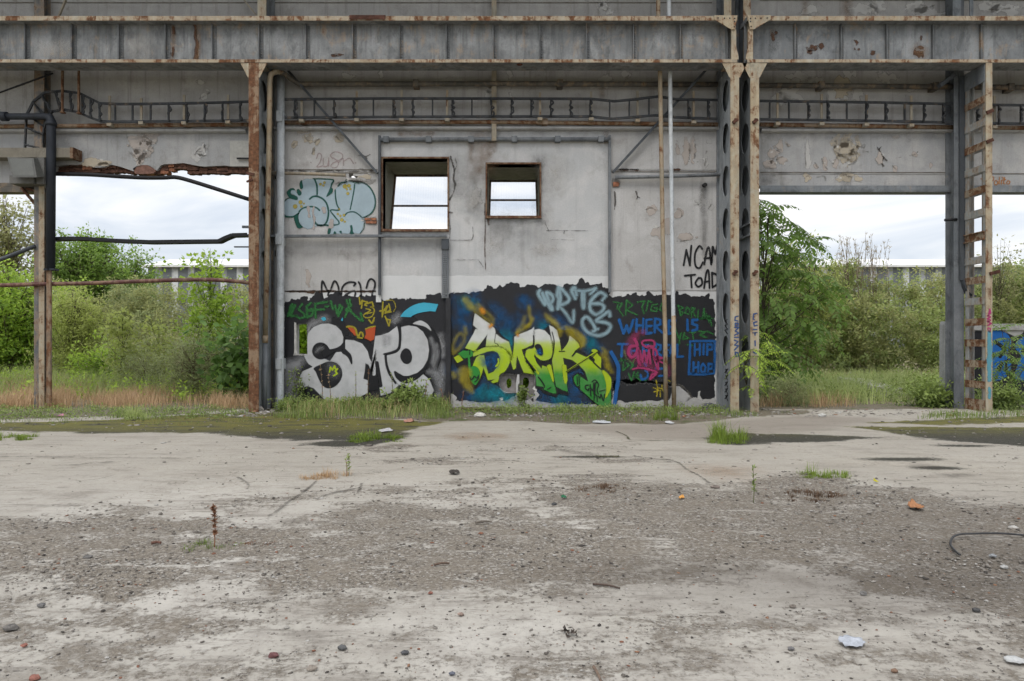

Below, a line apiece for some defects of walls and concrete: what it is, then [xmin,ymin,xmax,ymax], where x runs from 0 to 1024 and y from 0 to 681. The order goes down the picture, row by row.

spalling [58,133,249,176]
peeling [830,133,863,182]